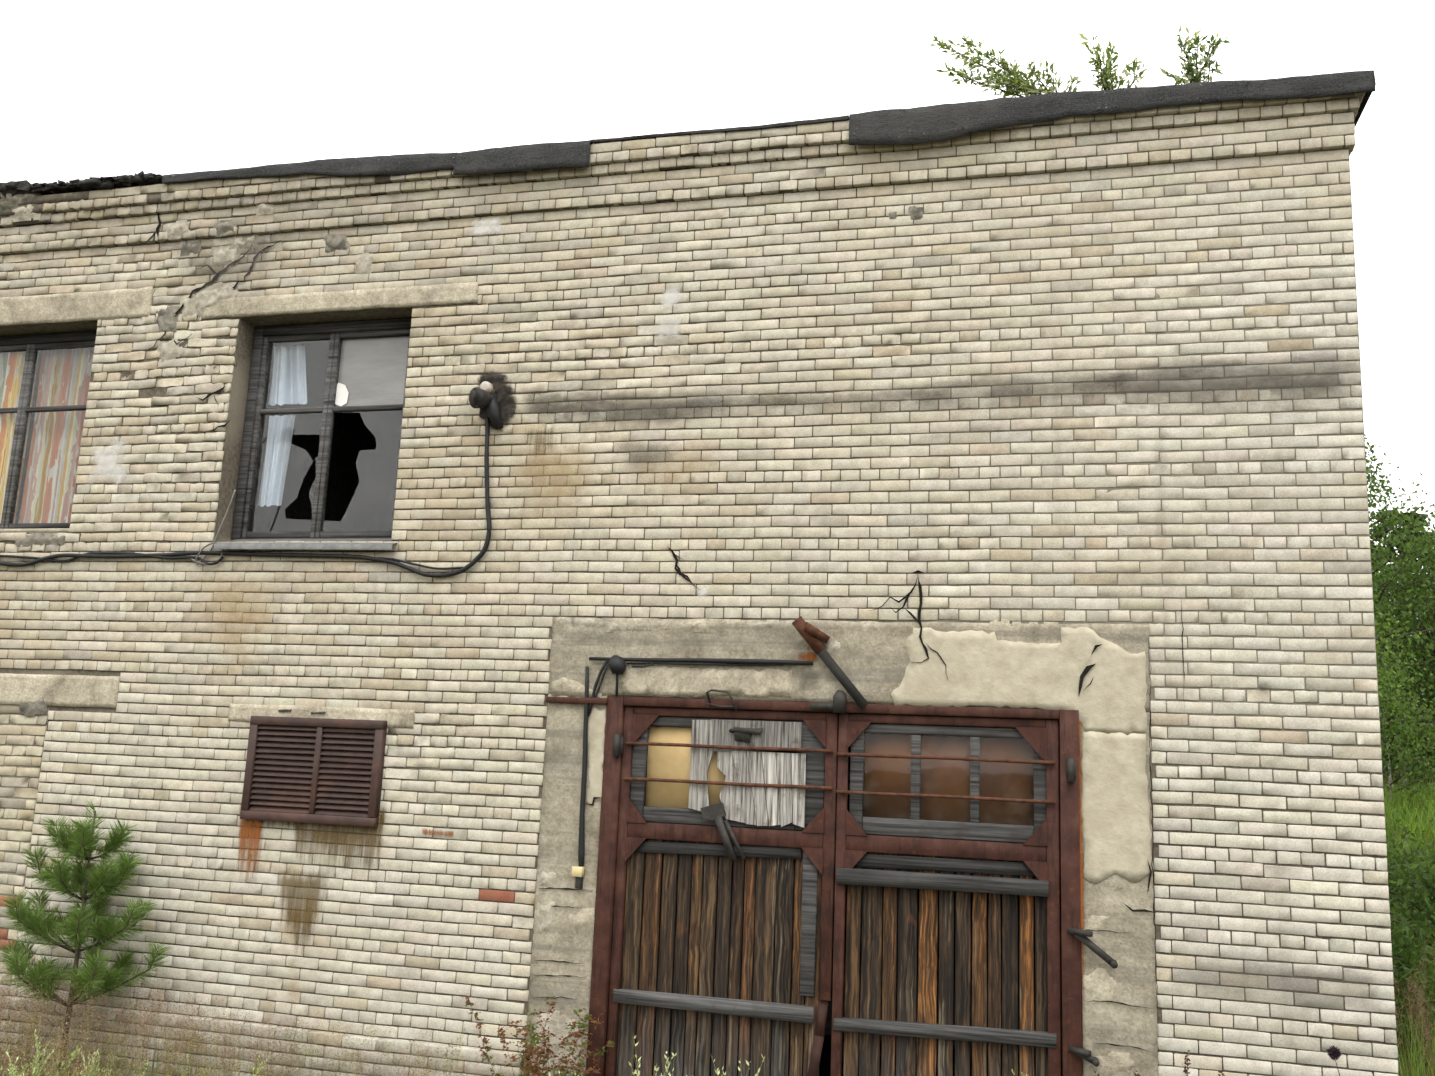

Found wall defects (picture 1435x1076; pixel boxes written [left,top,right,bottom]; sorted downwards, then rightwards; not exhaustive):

crack [144,213,161,244]
crack [149,240,282,349]
crack [668,547,700,590]
spalling [560,617,792,633]
crack [870,570,948,678]
peeling [891,619,1154,884]
rust [239,807,384,871]
rust [282,874,321,940]